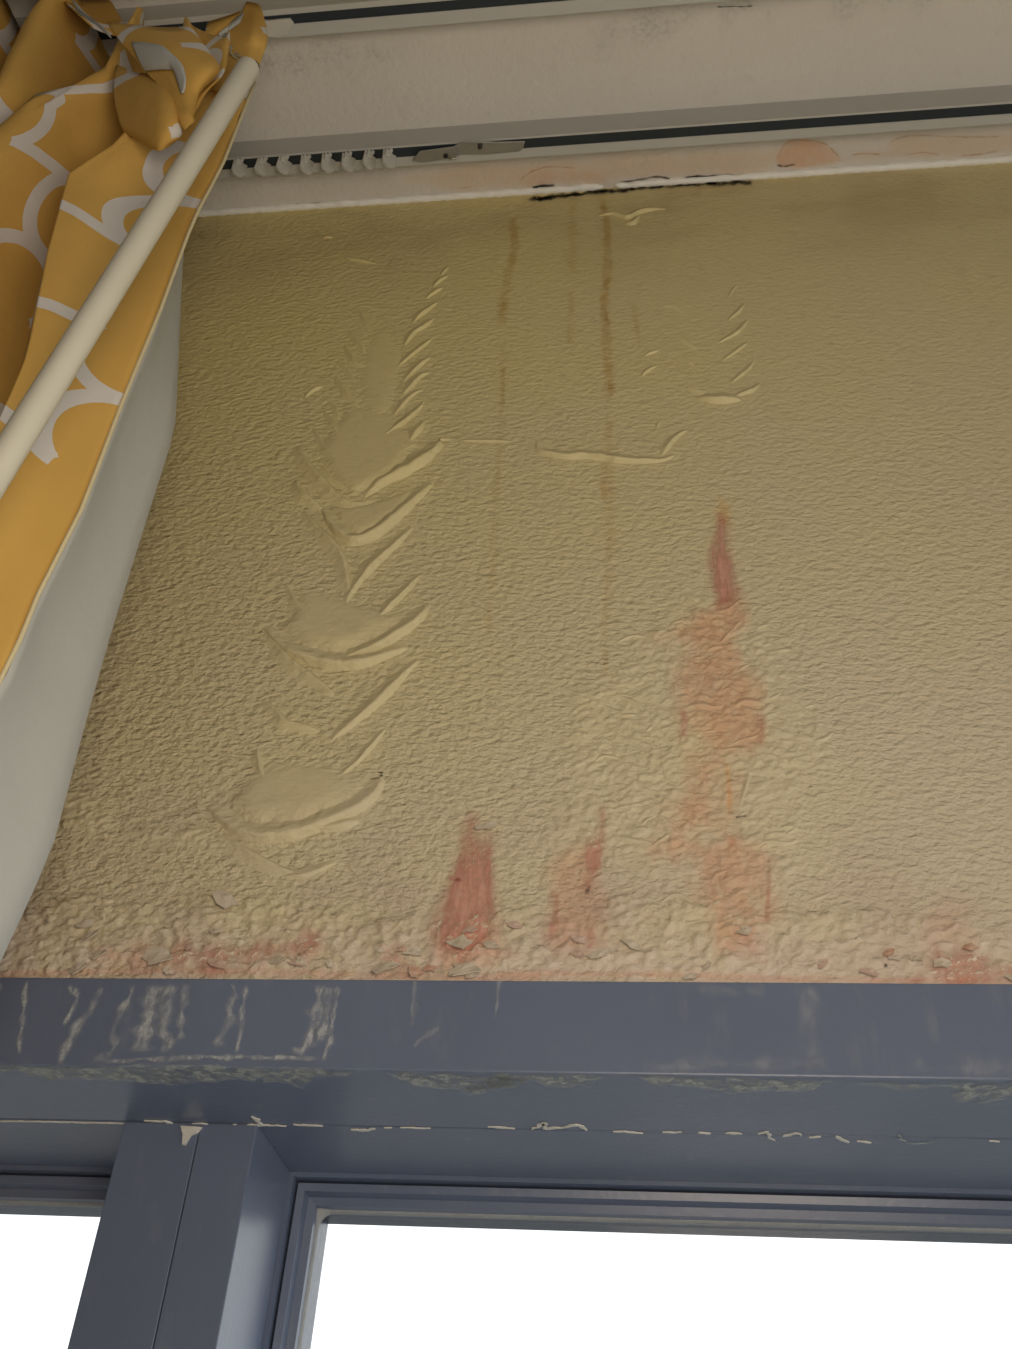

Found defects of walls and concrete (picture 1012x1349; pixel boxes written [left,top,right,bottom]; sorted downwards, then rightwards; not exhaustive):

crack [0,1116,431,1146]
crack [488,1122,871,1144]